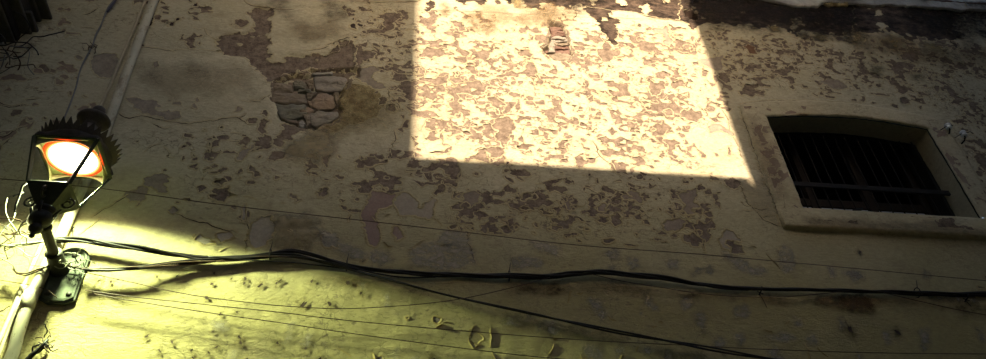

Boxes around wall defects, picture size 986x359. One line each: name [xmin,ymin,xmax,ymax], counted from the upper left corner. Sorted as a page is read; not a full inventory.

damp [564,0,605,12]
damp [683,0,863,44]
damp [902,0,986,50]